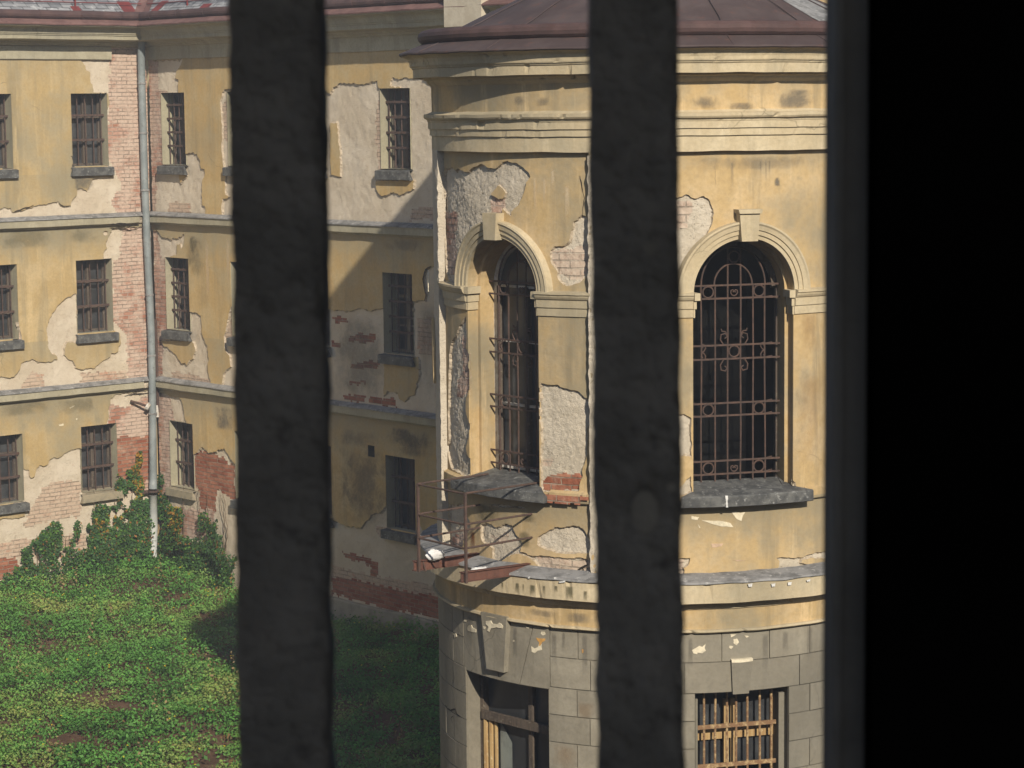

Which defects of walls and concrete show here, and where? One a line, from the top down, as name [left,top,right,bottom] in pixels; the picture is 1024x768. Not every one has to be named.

flaking render [0,47,205,218]
flaking render [0,225,234,391]
flaking render [220,89,231,215]
flaking render [328,77,530,476]
flaking render [449,156,596,583]
flaking render [679,194,714,266]
flaking render [0,390,238,587]
flaking render [331,506,439,622]
spalling [729,634,753,663]